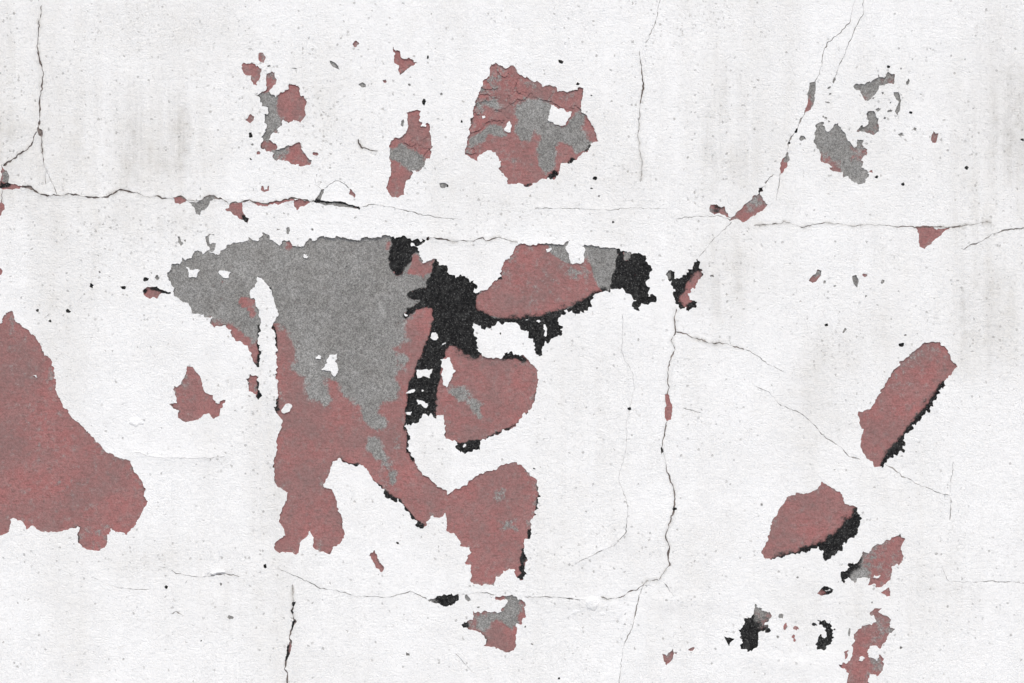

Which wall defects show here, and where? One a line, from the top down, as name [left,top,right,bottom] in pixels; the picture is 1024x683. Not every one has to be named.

crack [0,5,514,242]
peeling [461,63,598,187]
crack [637,2,660,176]
crack [765,4,864,197]
crack [535,207,1024,253]
peeling [0,311,148,551]
peeling [143,227,657,652]
crack [527,309,859,678]
peeling [761,482,862,561]
peeling [858,334,957,468]
crack [885,464,953,517]
peeling [817,535,905,683]